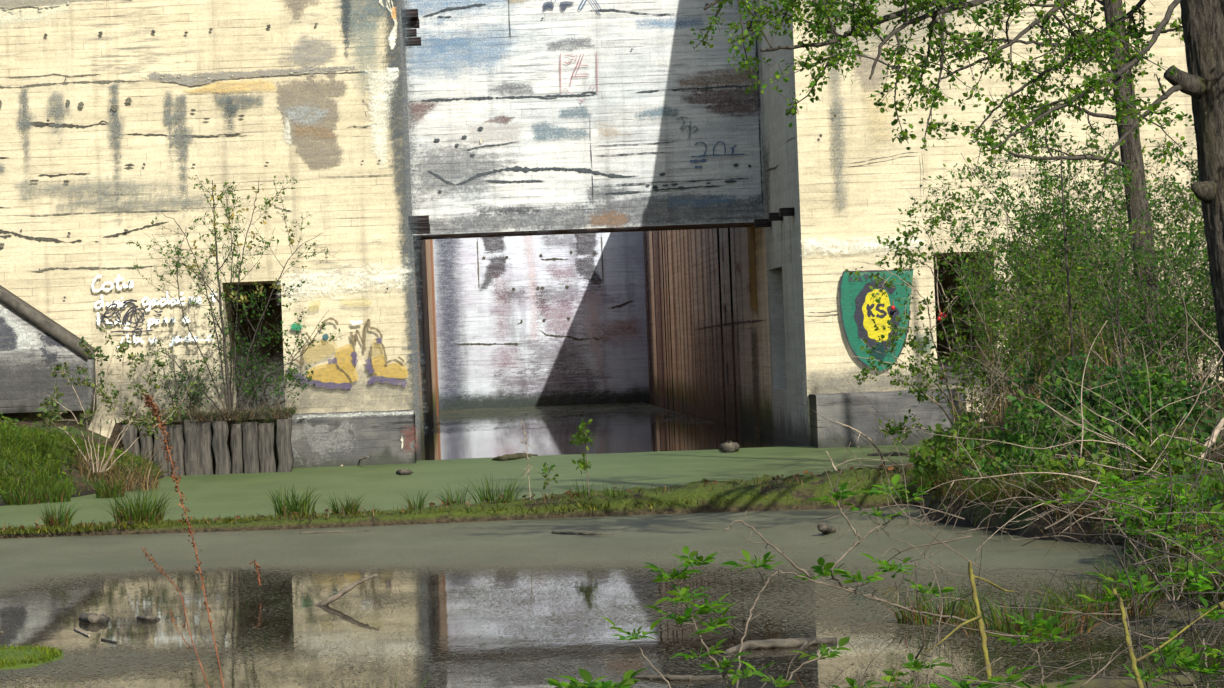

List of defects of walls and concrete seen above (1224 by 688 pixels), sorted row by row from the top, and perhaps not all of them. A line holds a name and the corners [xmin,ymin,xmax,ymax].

leakage [0,0,770,453]